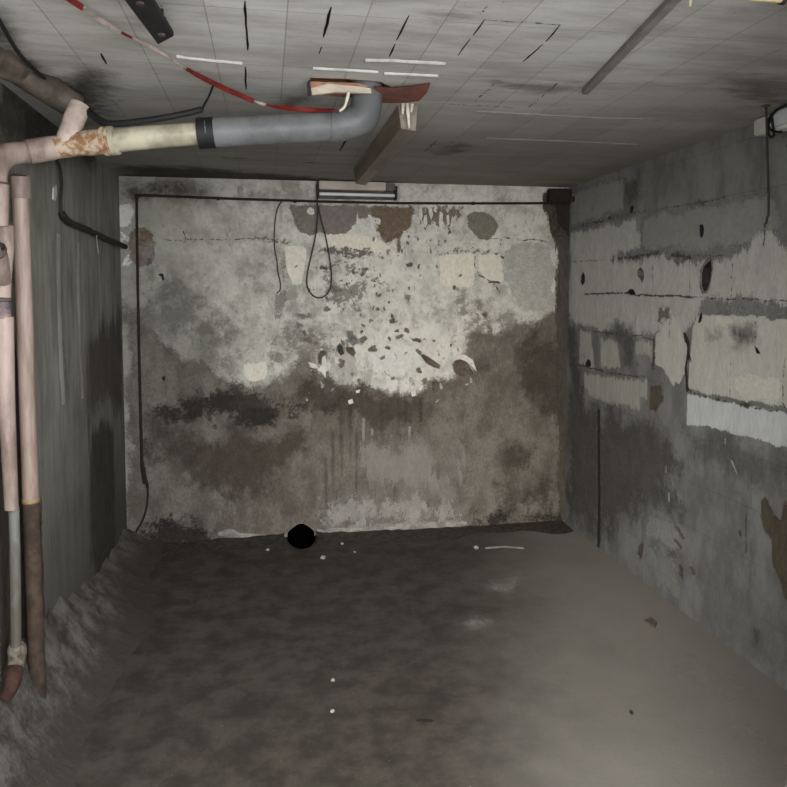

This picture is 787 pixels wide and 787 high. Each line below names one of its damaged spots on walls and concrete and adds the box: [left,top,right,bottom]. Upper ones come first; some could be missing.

peeling [289,204,382,236]
peeling [418,205,464,253]
spalling [700,257,713,294]
peeling [302,301,443,404]
leakage [87,191,678,572]
spalling [450,340,476,386]
peeling [653,314,688,387]
leakage [761,497,787,600]